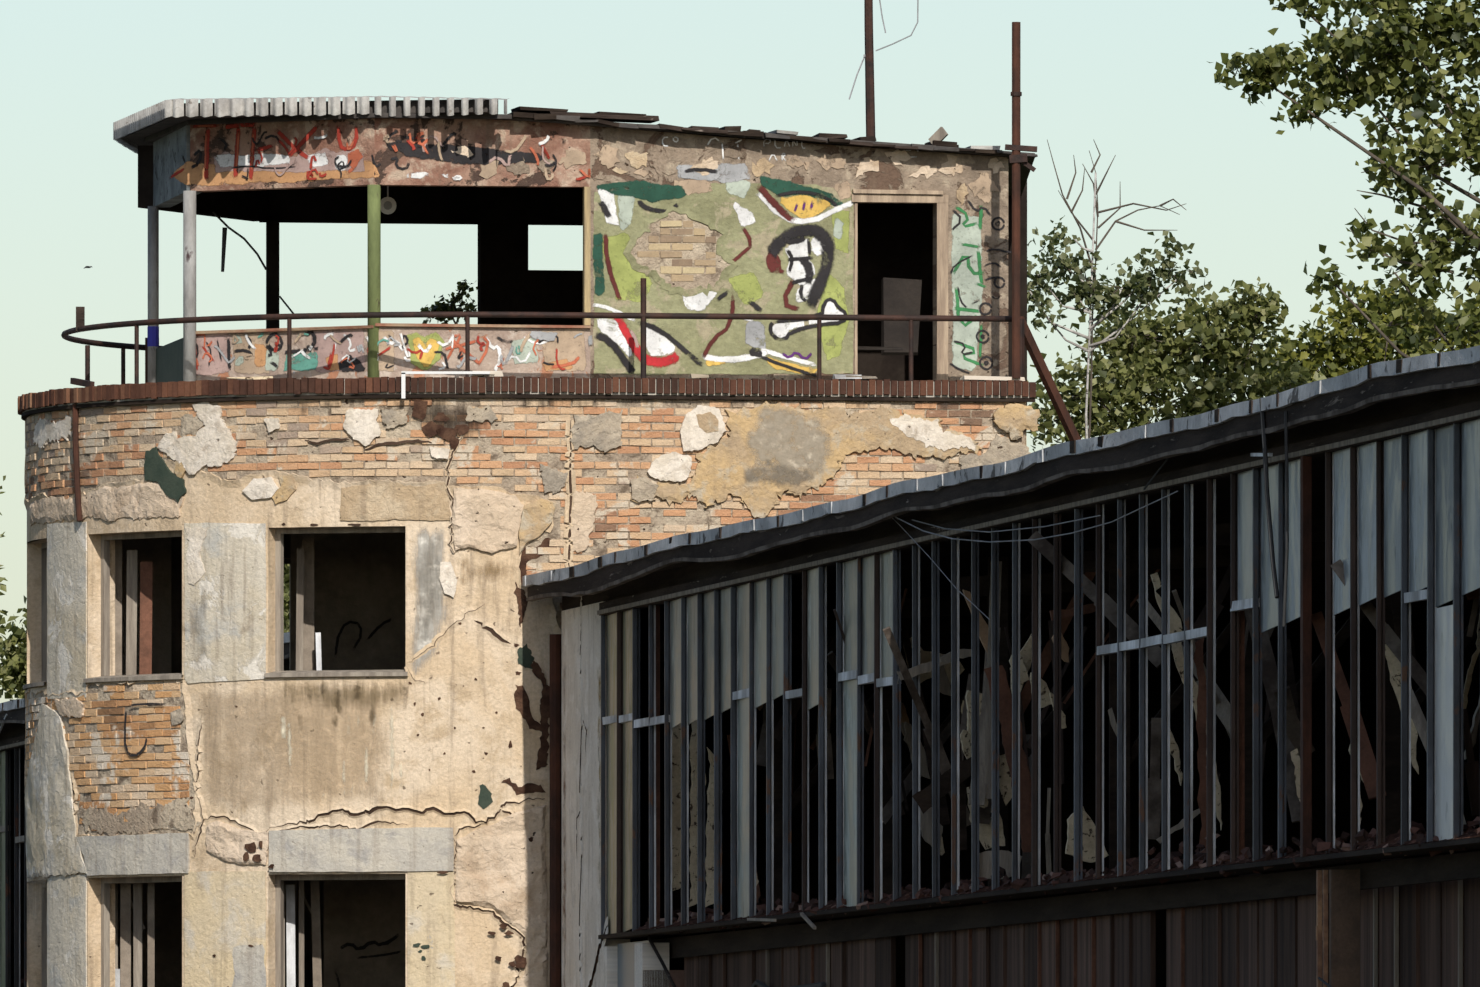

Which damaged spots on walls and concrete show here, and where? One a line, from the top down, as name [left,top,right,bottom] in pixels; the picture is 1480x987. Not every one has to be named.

spalling [623,204,738,297]
spalling [24,680,274,880]
crack [191,420,608,987]
spalling [24,398,1040,809]